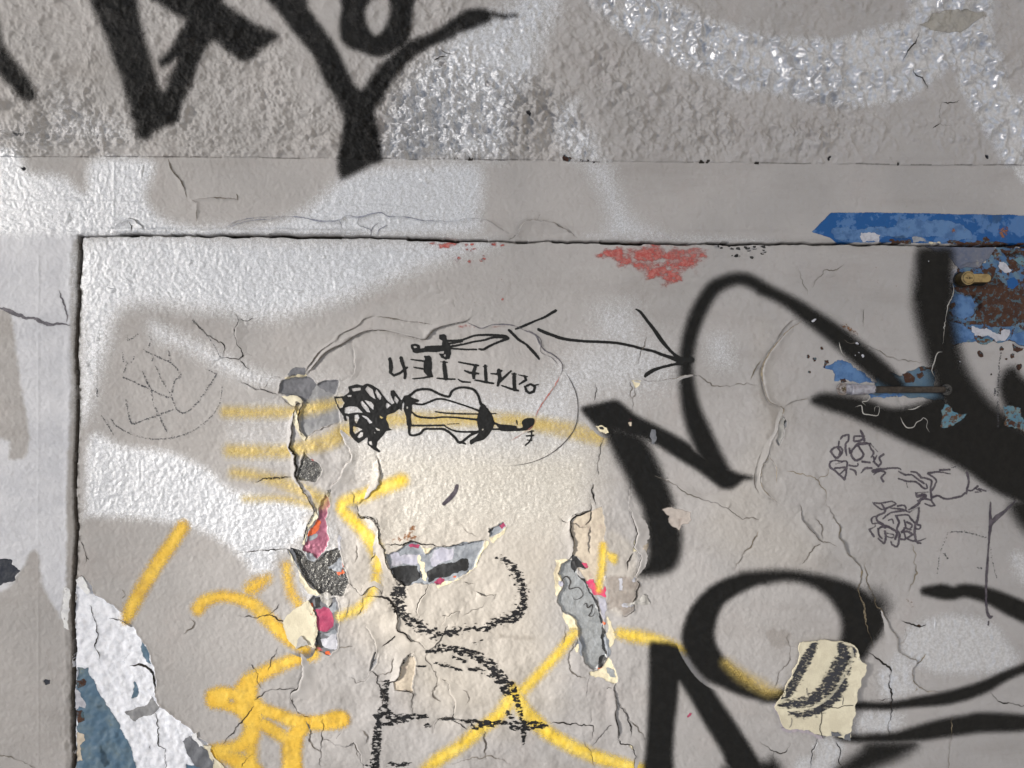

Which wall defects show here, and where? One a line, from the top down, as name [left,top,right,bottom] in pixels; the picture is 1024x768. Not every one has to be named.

crack [0,291,68,326]
peeling [812,212,1024,346]
peeling [61,576,224,768]
peeling [279,367,340,482]
peeling [283,489,349,656]
crack [193,315,511,765]
crack [561,387,604,559]
peeling [571,507,606,589]
crack [547,626,642,768]
crack [624,481,650,617]
crack [789,470,930,761]
peeling [823,342,966,428]